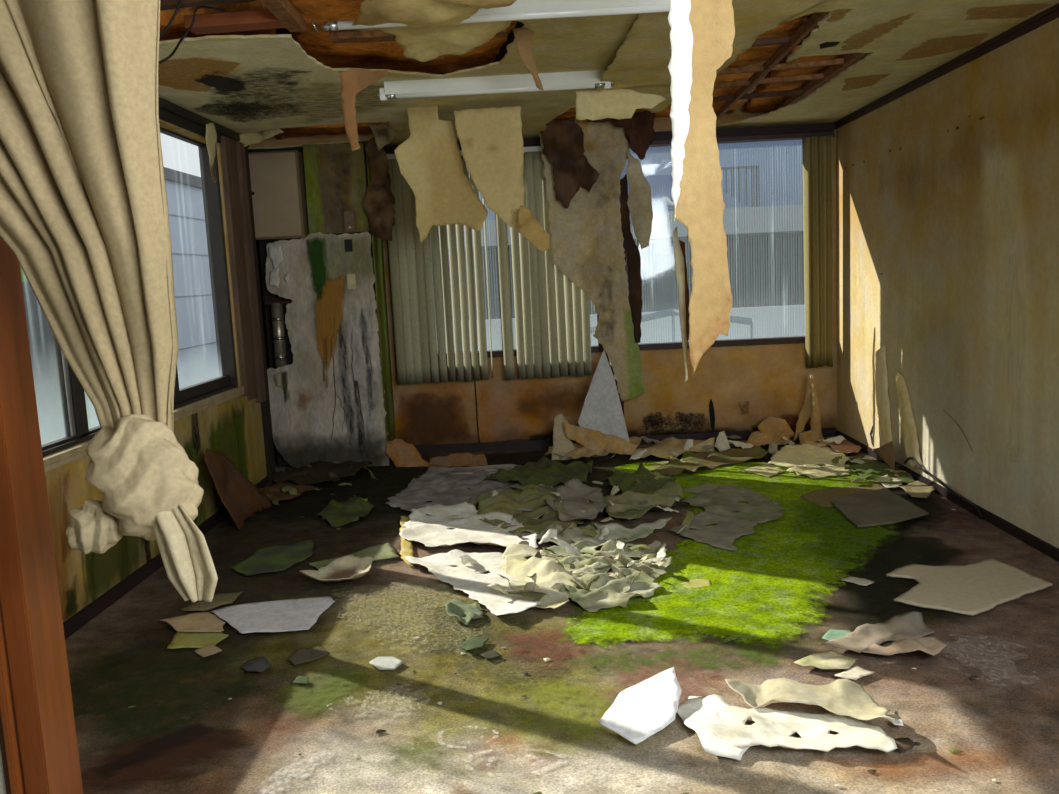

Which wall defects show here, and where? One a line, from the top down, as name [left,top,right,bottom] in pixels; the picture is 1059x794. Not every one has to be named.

peeling [841,15,912,51]
leakage [195,68,342,122]
peeling [541,118,600,209]
flaking render [268,245,290,288]
leakage [184,407,248,526]
leakage [54,551,77,618]
leakage [86,535,151,602]